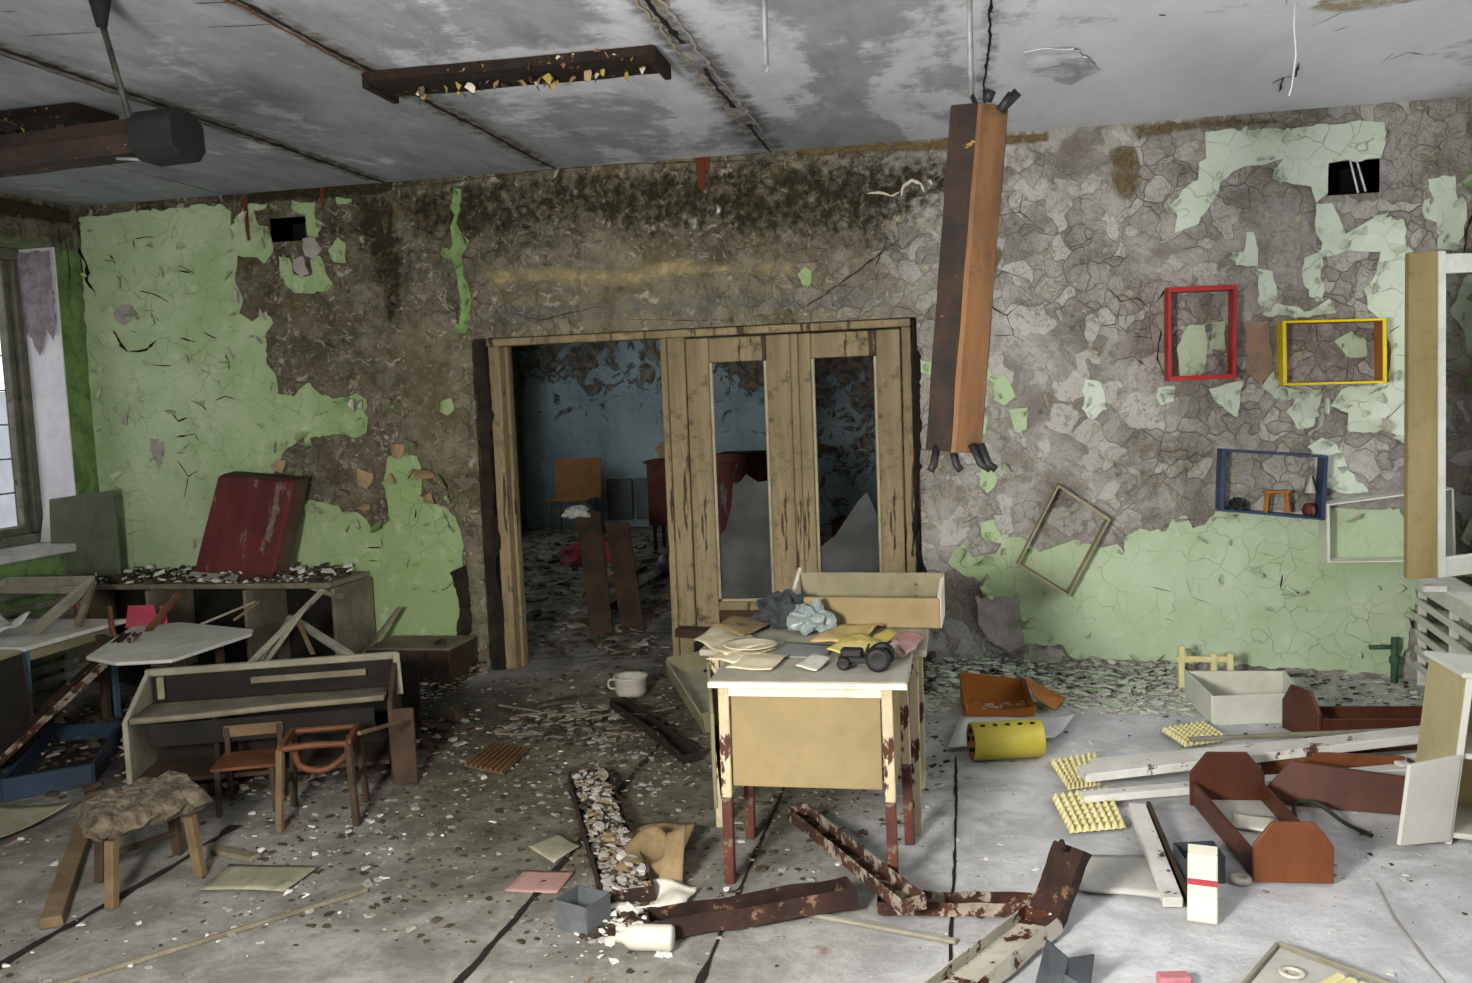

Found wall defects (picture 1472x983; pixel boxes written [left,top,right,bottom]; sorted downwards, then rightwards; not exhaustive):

crack [58,229,234,497]
peeling [79,200,395,573]
water stain [248,182,402,321]
peeling [278,188,507,670]
water stain [489,260,730,285]
water stain [414,138,948,244]
crack [911,319,927,573]
water stain [1006,132,1048,144]
crack [1102,281,1170,375]
peeling [948,120,1417,677]
peeling [1422,167,1472,251]
crack [1464,215,1472,253]